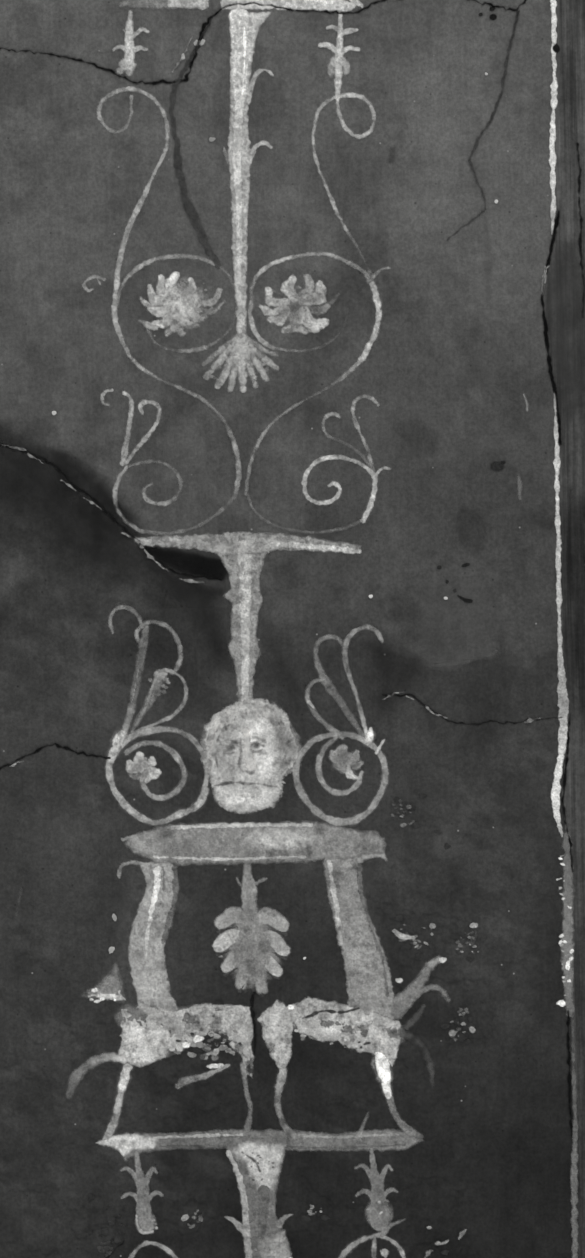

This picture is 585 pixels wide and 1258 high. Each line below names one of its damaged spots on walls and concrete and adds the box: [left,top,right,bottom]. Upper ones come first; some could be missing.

crack [0,0,386,268]
crack [447,0,526,240]
crack [0,443,221,584]
crack [0,743,111,770]
crack [383,692,573,872]